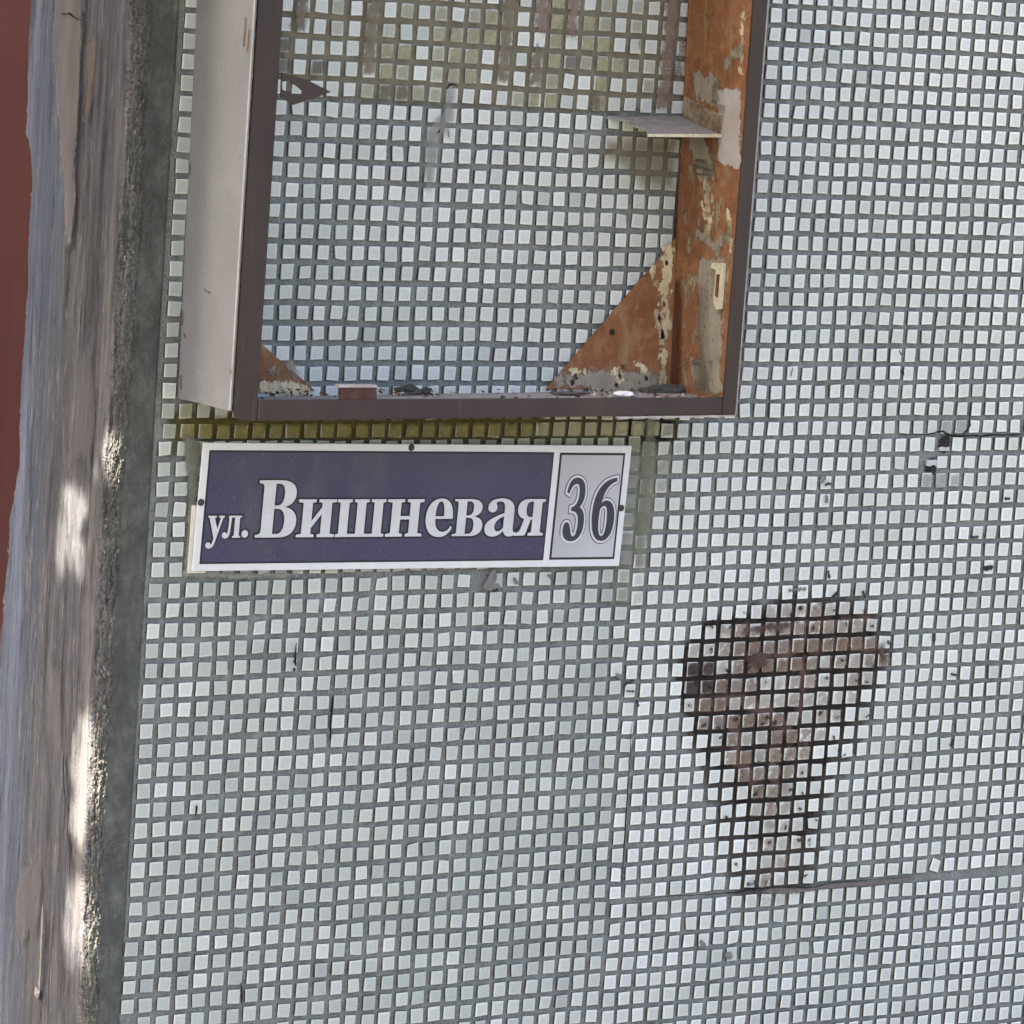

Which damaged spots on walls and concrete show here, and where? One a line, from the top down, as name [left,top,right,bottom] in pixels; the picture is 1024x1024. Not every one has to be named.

rust [670,280,681,385]
crack [621,728,914,900]
rust [675,589,891,896]